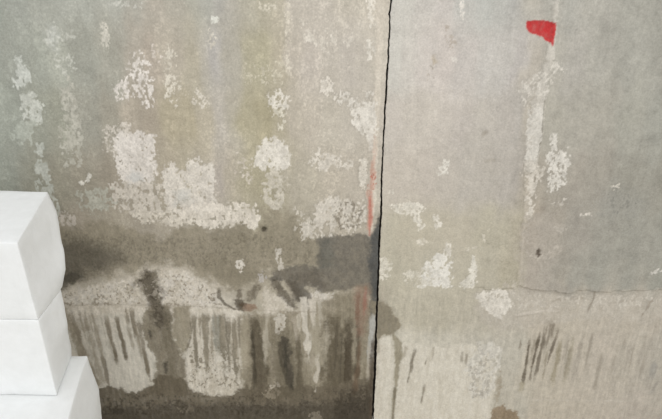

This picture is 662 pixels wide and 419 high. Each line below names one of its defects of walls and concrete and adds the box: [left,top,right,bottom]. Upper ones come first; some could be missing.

peeling [7,0,381,242]
leakage [59,203,418,419]
rust [365,129,379,237]
crack [372,0,392,417]
spalling [402,241,662,334]
peeling [517,60,572,220]
crack [523,286,656,319]
leakage [517,314,662,396]